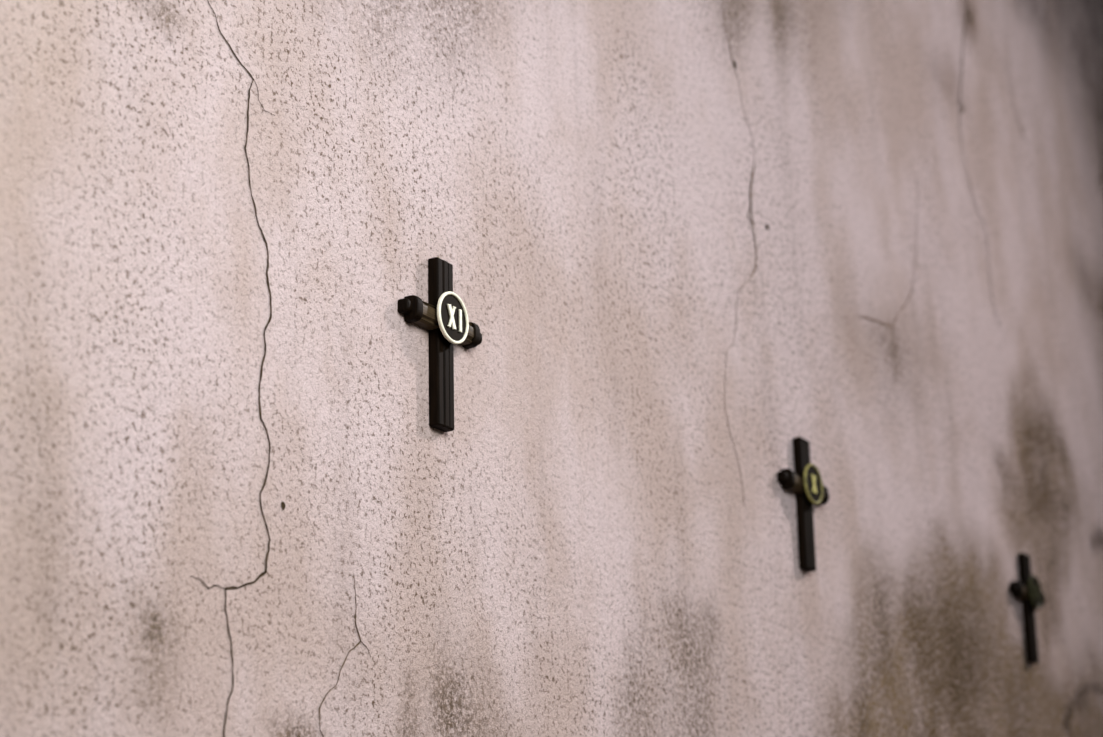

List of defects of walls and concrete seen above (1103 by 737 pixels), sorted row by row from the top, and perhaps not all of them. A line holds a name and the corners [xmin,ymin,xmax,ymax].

crack [723,8,757,382]
crack [959,1,1000,328]
crack [192,1,275,737]
crack [319,578,371,737]
leakage [835,531,1103,737]